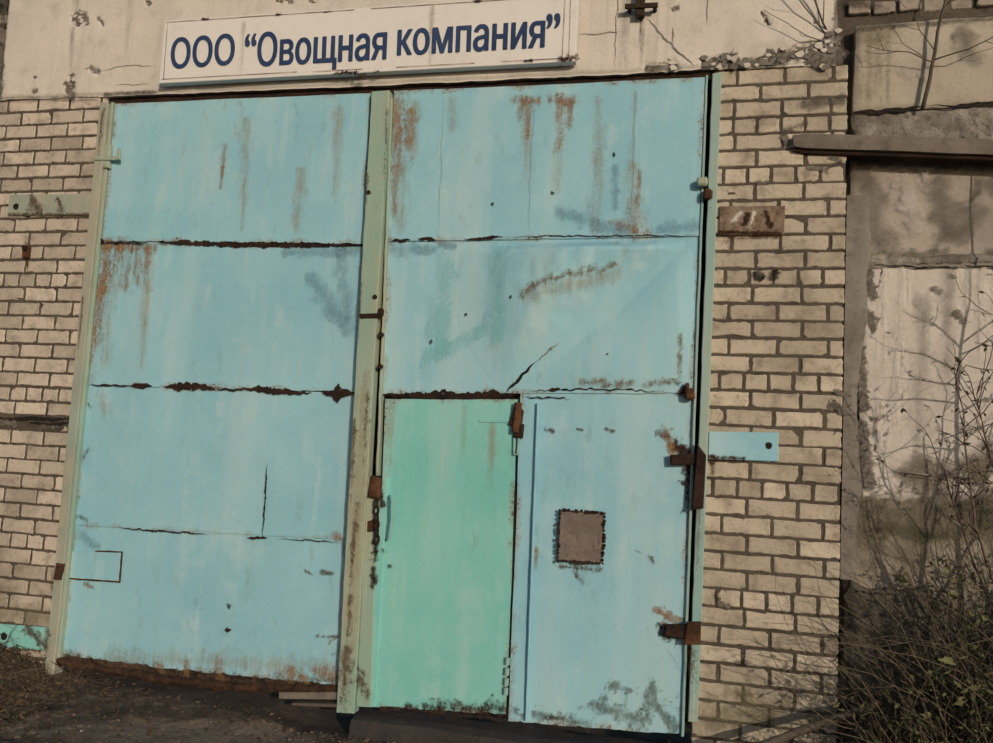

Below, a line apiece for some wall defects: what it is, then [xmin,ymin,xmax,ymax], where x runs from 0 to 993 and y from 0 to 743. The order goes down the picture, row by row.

crack [647,18,692,63]
spalling [700,28,850,70]
rust [520,97,574,137]
rust [63,394,373,711]
rust [370,541,385,589]
rust [379,694,524,718]